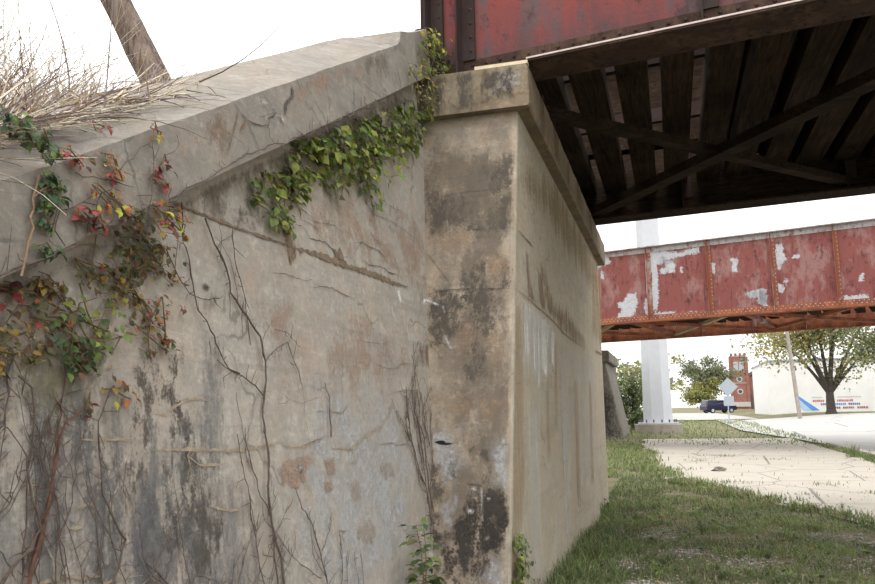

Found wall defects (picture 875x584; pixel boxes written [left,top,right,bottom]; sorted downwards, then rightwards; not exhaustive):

crack [173,199,408,297]
leakage [423,261,509,378]
crack [370,215,602,355]
leakage [524,305,555,385]
peeling [617,247,699,318]
peeling [744,288,769,306]
peeling [775,244,800,293]
leakage [125,349,245,584]
leakage [431,435,456,503]
leakage [433,447,508,583]